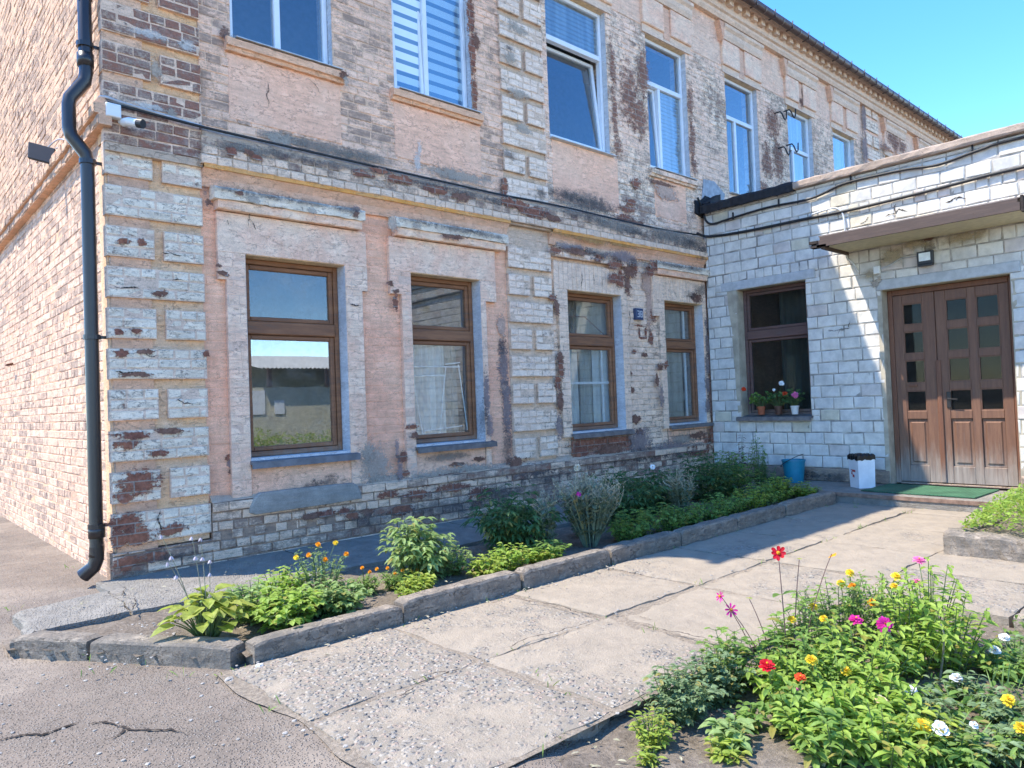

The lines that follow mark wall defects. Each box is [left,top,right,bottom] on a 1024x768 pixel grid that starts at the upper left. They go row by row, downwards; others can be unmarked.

peeling [466,0,481,110]
peeling [609,35,651,157]
leakage [228,131,384,164]
leakage [414,142,489,184]
peeling [759,99,786,190]
leakage [556,189,639,233]
leakage [655,229,694,246]
peeling [550,245,661,358]
peeling [112,348,155,358]
leakage [483,340,556,479]
peeling [103,427,190,579]
crack [0,721,185,740]